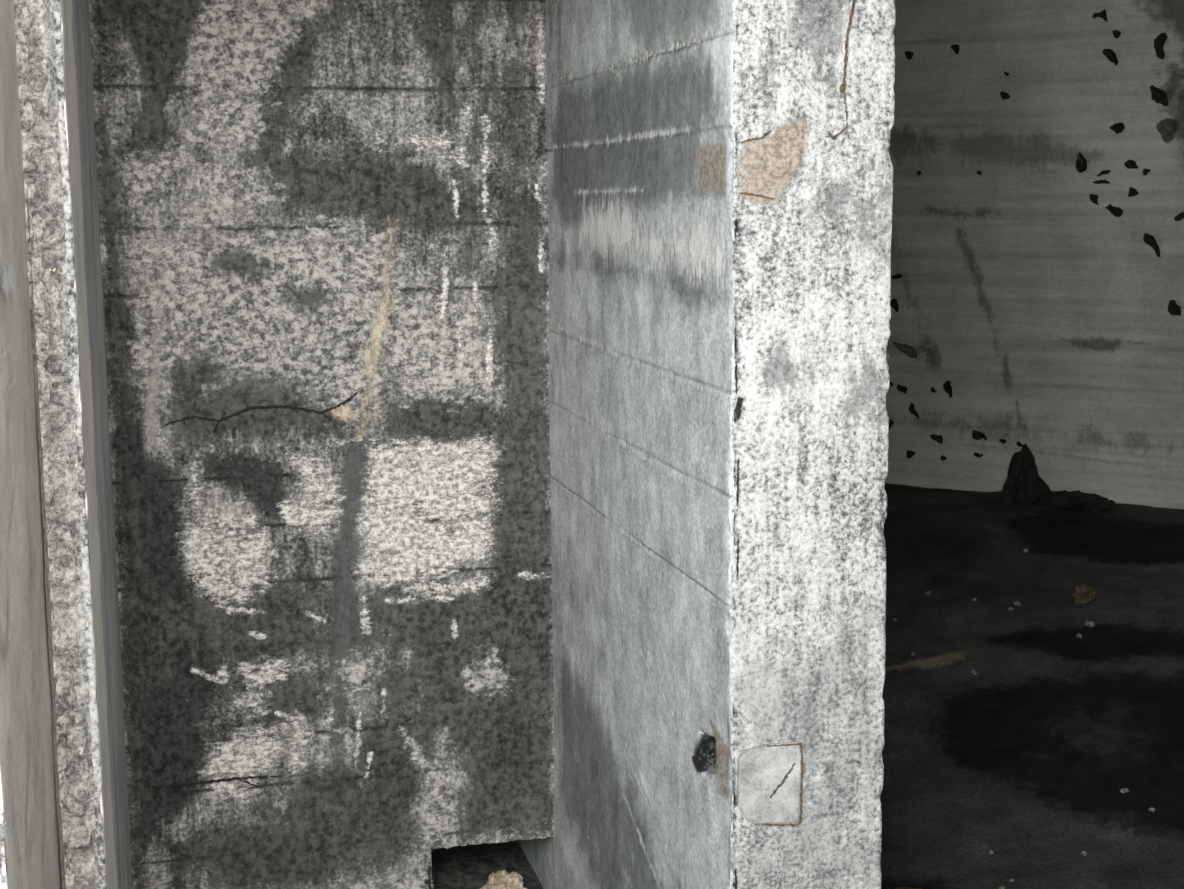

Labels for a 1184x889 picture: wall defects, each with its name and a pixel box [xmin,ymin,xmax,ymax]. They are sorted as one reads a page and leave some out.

crack [828,0,856,140]
crack [166,393,357,432]
water stain [1071,339,1120,350]
water stain [332,442,368,792]